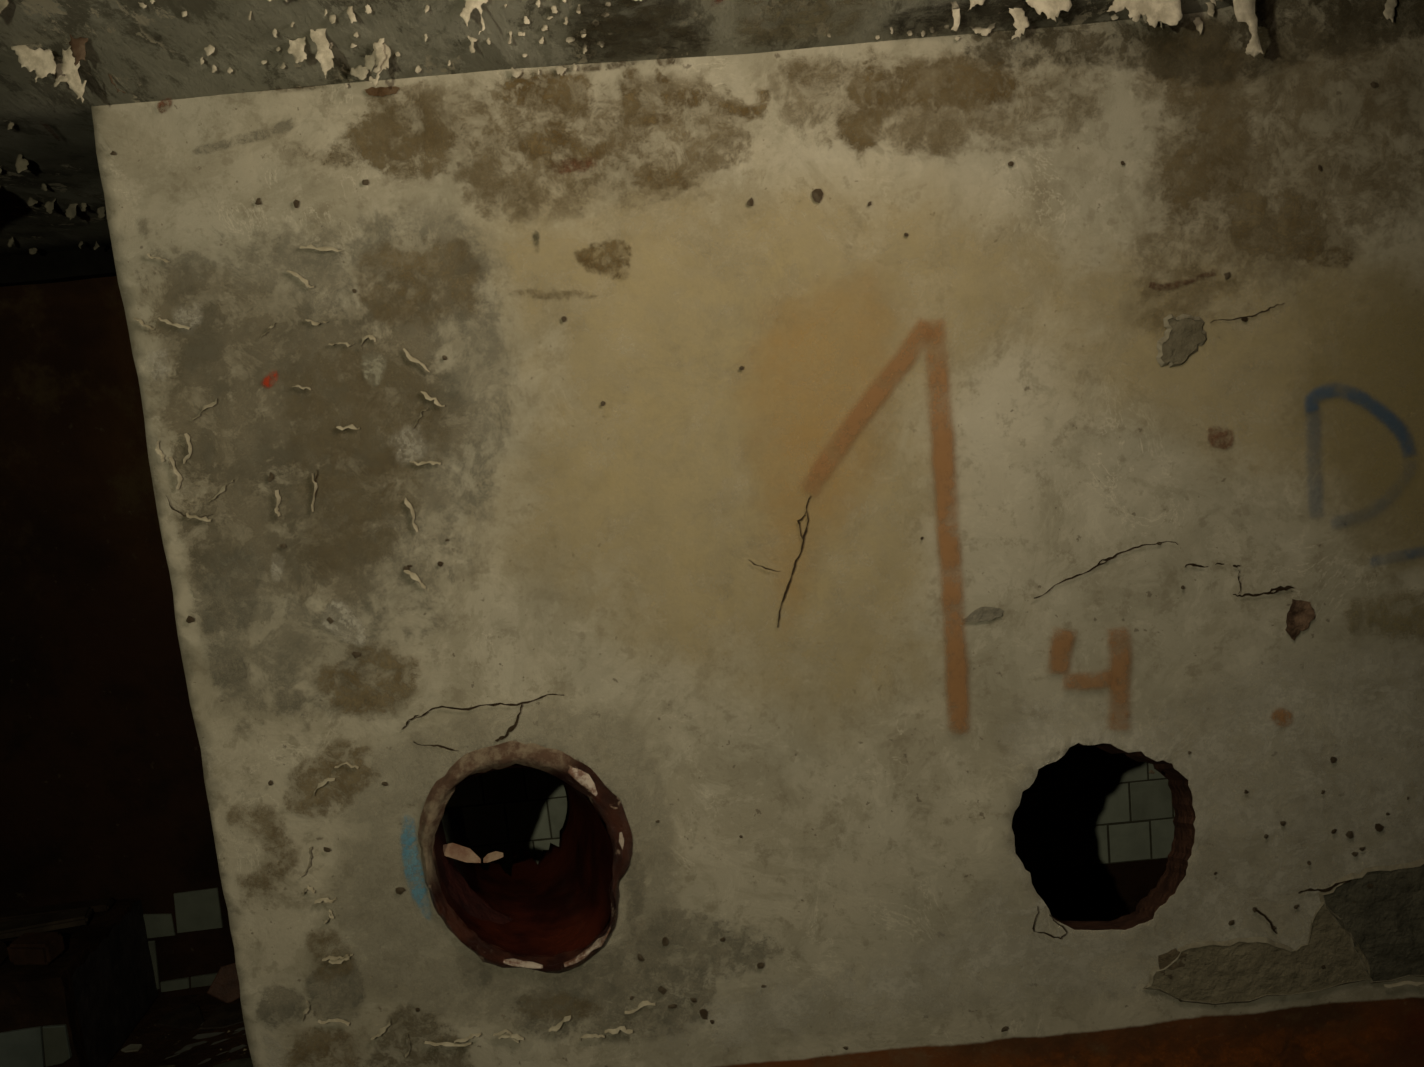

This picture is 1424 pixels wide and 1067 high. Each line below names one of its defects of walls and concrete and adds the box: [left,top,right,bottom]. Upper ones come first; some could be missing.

peeling [11,34,88,103]
peeling [261,4,400,97]
peeling [875,0,1072,41]
peeling [1106,0,1263,58]
leakage [786,0,1424,552]
leakage [306,0,1030,696]
leakage [151,218,501,715]
crack [748,496,811,627]
crack [401,694,564,751]
leakage [228,742,378,894]
spalling [1143,829,1424,1005]
leakage [256,933,474,1067]